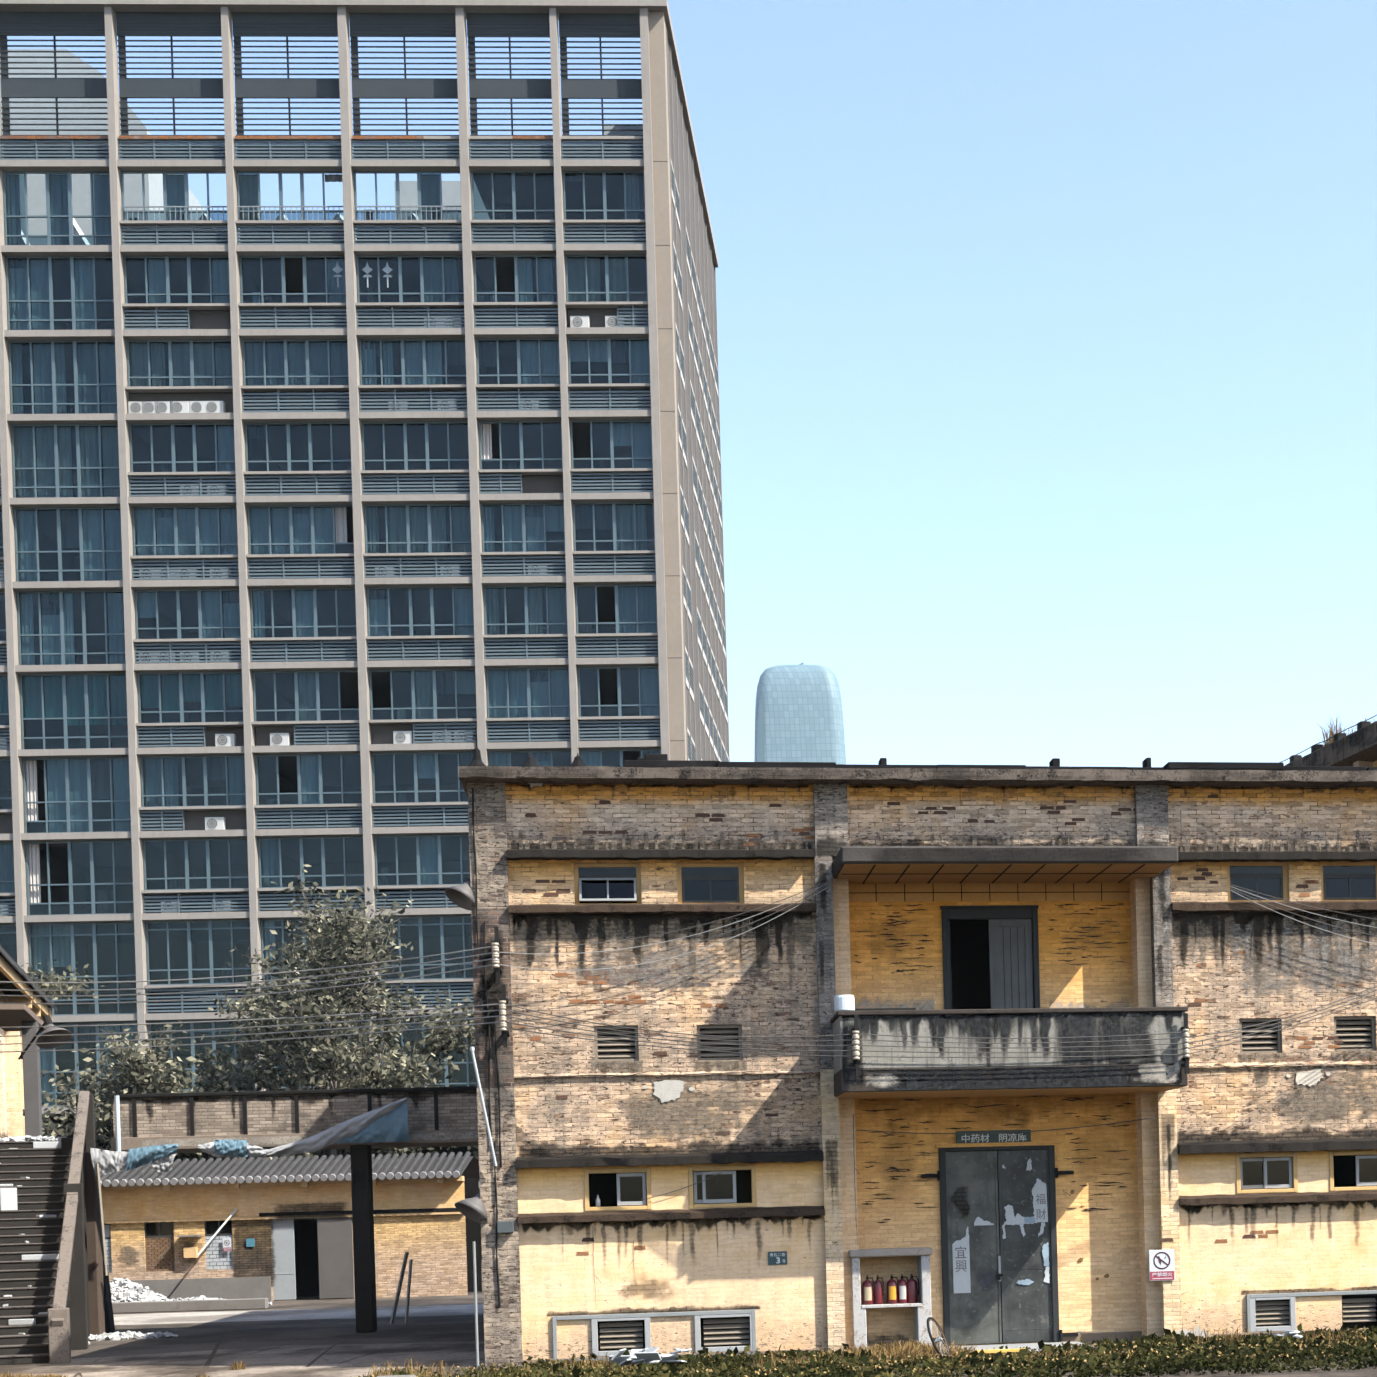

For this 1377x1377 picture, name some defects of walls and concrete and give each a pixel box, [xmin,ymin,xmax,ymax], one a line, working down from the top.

damp [876,830,1377,860]
damp [477,831,847,1035]
damp [1154,869,1377,987]
damp [855,1000,946,1054]
damp [972,1002,1088,1057]
spalling [643,1080,695,1103]
spalling [1286,1069,1330,1087]
damp [1162,1117,1377,1191]
damp [522,1215,821,1252]
damp [1181,1200,1377,1238]